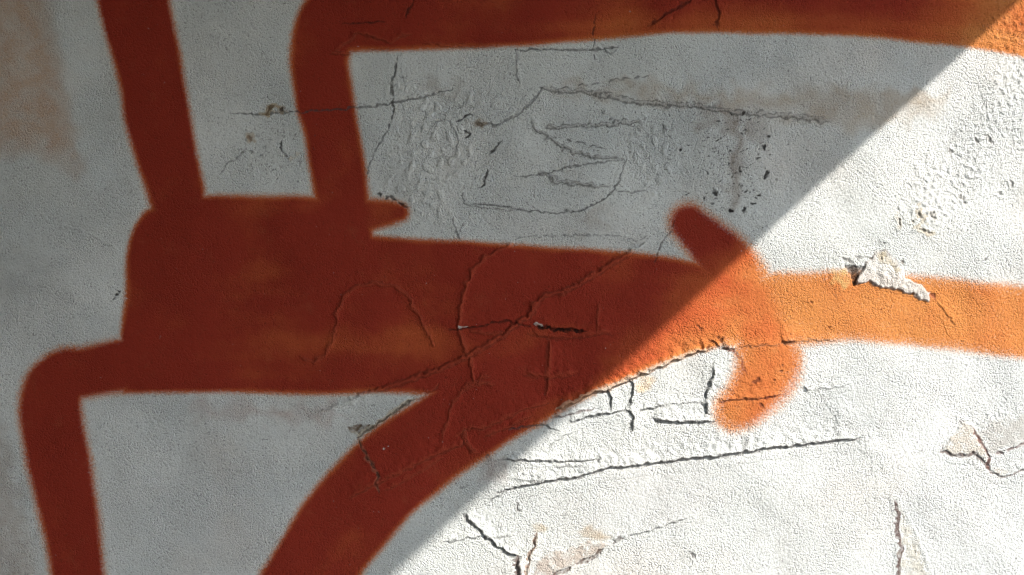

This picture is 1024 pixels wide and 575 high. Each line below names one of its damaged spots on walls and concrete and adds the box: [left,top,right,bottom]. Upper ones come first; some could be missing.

crack [215,50,413,213]
crack [436,11,834,218]
crack [521,300,621,346]
spalling [832,204,969,346]
crack [433,330,873,575]
peeling [932,406,1024,485]